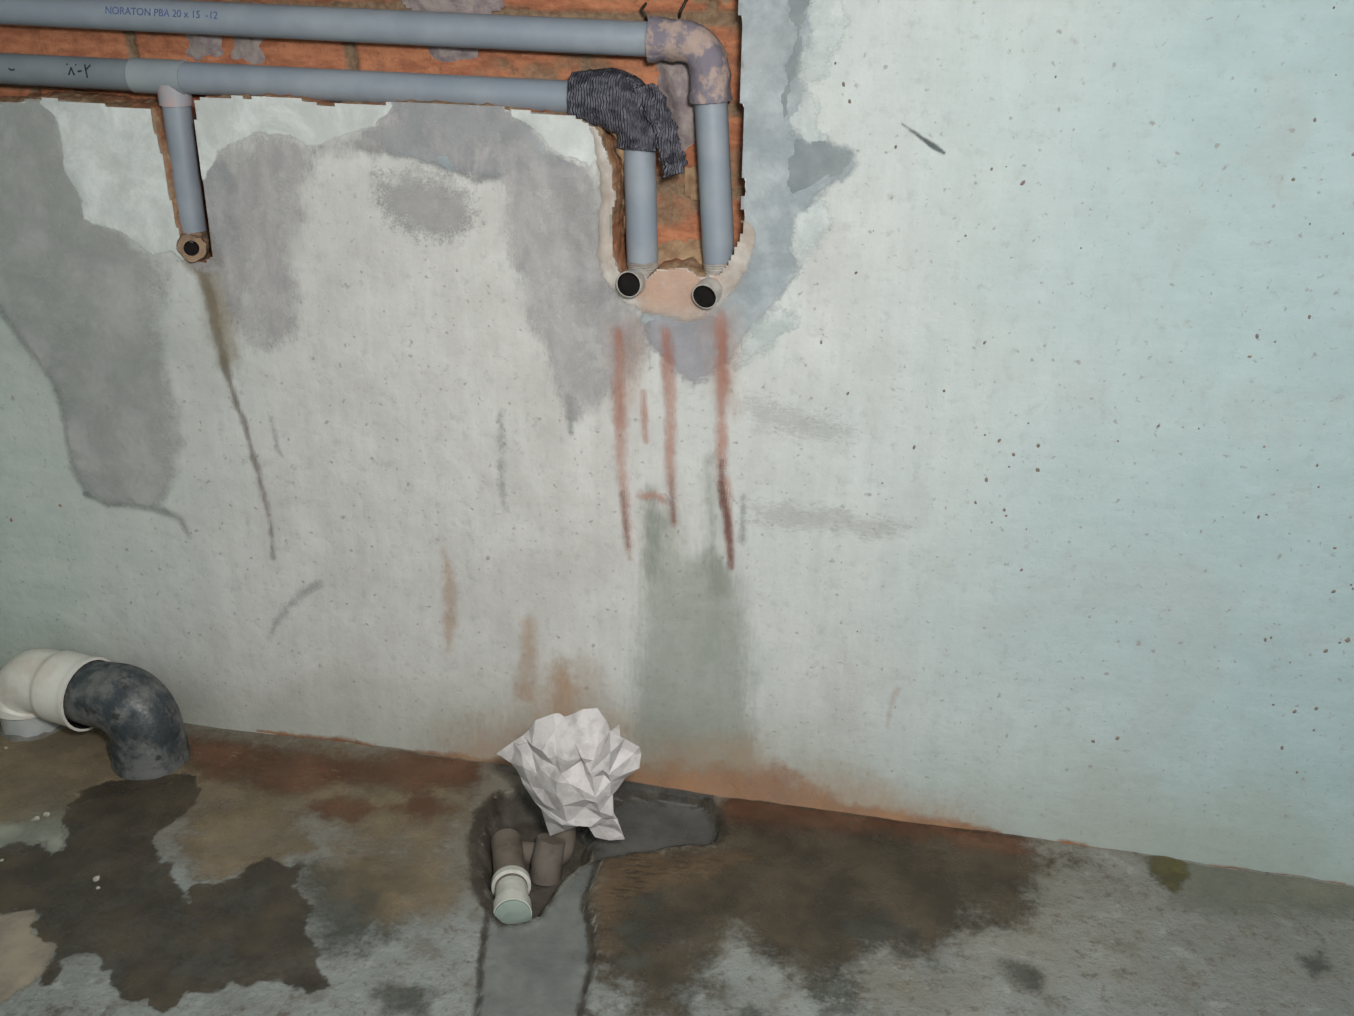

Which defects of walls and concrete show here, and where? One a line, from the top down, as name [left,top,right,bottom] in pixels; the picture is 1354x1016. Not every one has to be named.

flaking render [0,0,746,279]
flaking render [191,93,730,417]
corrosion [718,482,732,568]
water stain [0,774,395,1012]
corrosion [188,731,513,820]
corrosion [624,766,1027,852]